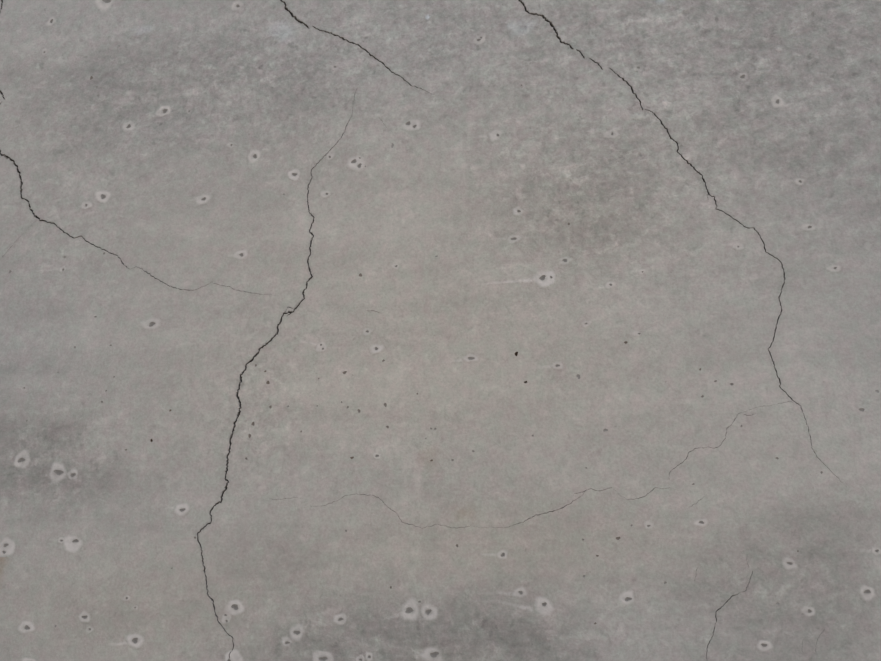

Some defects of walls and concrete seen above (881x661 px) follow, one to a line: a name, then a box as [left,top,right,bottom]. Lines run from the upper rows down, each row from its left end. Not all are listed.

crack [0,0,8,31]
crack [0,76,8,107]
crack [0,84,359,658]
crack [272,0,846,529]